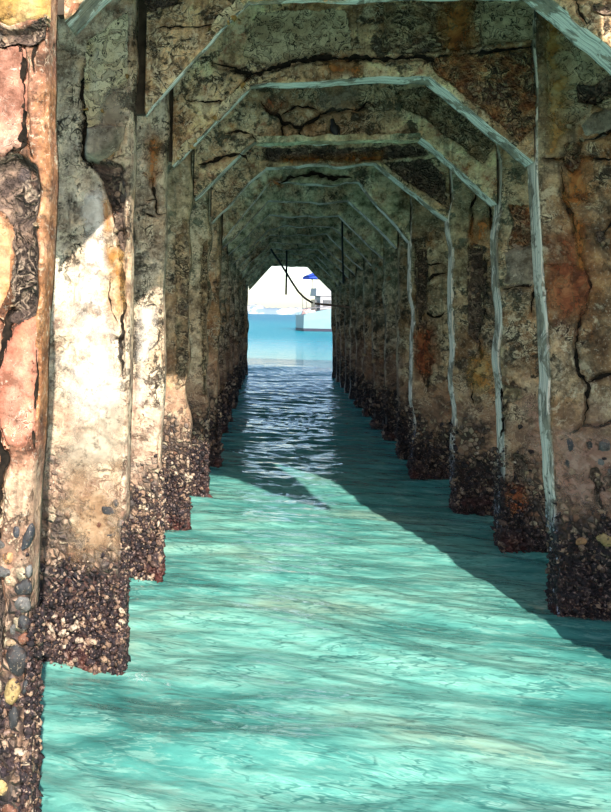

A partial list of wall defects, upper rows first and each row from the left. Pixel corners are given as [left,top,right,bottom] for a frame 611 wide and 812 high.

crack [187,46,532,103]
crack [261,102,373,136]
crack [544,130,611,440]
rust [414,326,438,380]